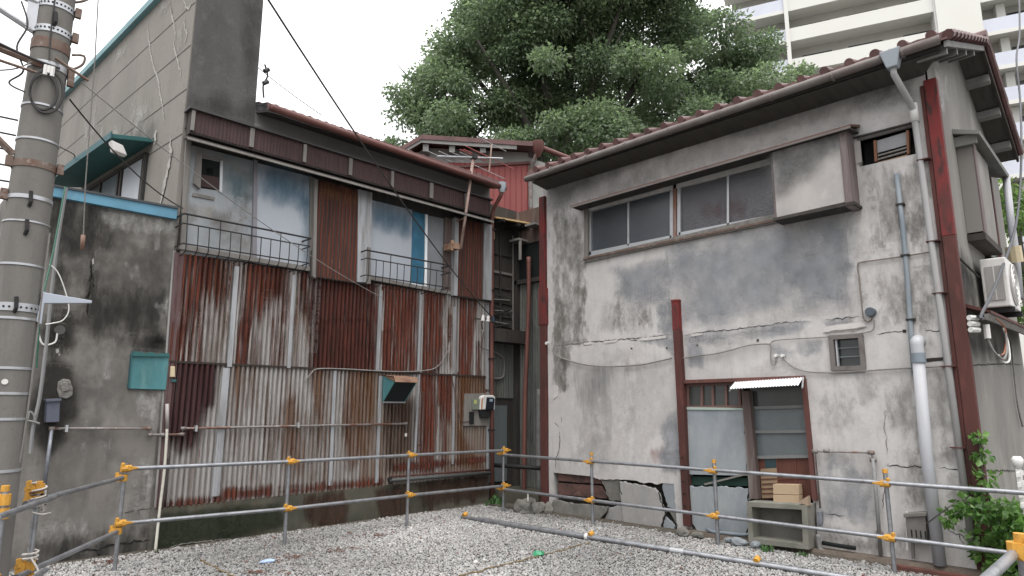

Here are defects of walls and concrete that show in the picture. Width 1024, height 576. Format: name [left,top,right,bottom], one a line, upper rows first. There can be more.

crack [147,1,191,203]
leakage [50,207,174,256]
leakage [555,217,585,301]
leakage [91,259,168,353]
corrosion [157,253,488,526]
leakage [555,302,581,390]
crack [556,316,859,346]
crack [658,485,678,527]